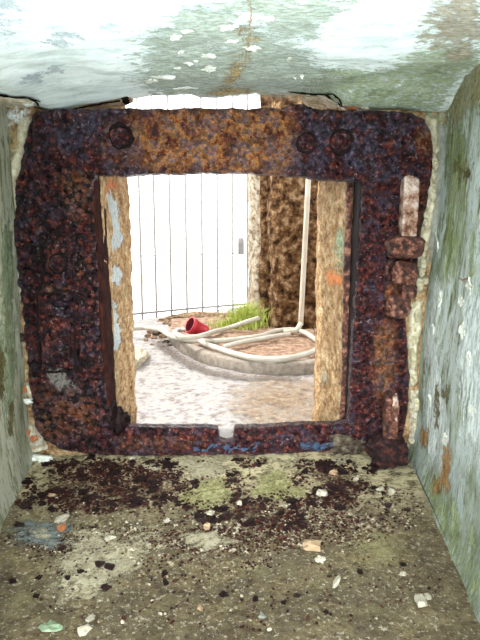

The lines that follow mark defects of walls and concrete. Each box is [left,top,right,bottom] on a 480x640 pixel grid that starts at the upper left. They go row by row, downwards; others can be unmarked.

crack [242,0,252,62]
leakage [412,0,480,62]
mould [21,66,65,84]
crack [288,91,343,107]
leakage [453,131,472,185]
leakage [433,384,450,429]
corrosion [432,443,452,495]